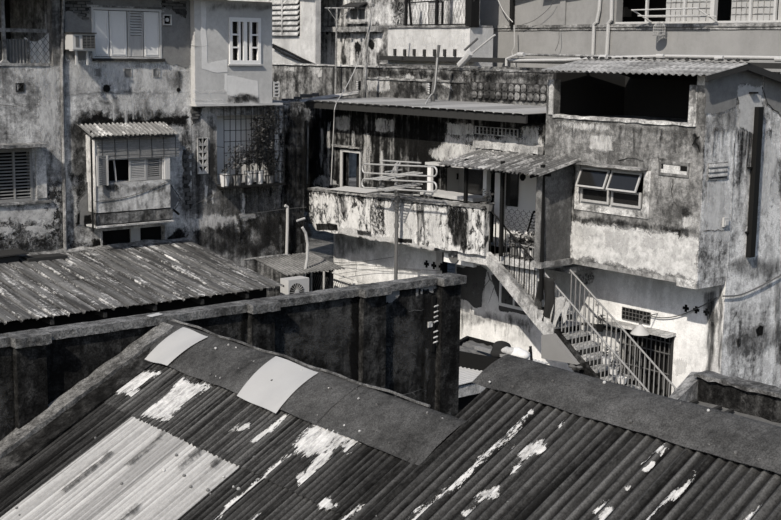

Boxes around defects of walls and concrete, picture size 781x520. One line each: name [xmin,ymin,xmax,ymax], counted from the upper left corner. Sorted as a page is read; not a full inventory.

damp [366,45,541,101]
damp [168,104,467,261]
damp [714,110,752,184]
damp [759,133,781,213]
damp [0,232,107,252]
damp [732,258,779,275]
peeling [116,370,162,397]
peeling [141,378,211,421]
peeling [215,425,361,519]
peeling [412,409,546,520]
peeling [641,443,667,472]
peeling [646,471,696,520]